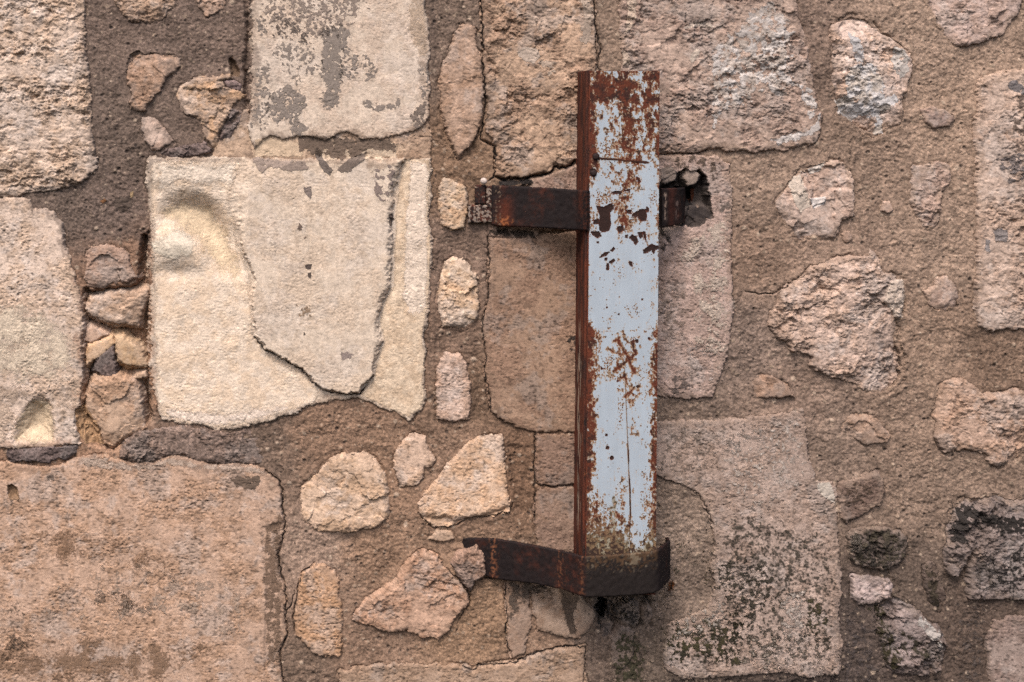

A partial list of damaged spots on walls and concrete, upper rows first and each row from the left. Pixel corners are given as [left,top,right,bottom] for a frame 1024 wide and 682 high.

rust [487,228,536,239]
rust [586,71,671,556]
peeling [659,166,736,396]
crack [267,472,314,682]
water stain [669,606,880,682]